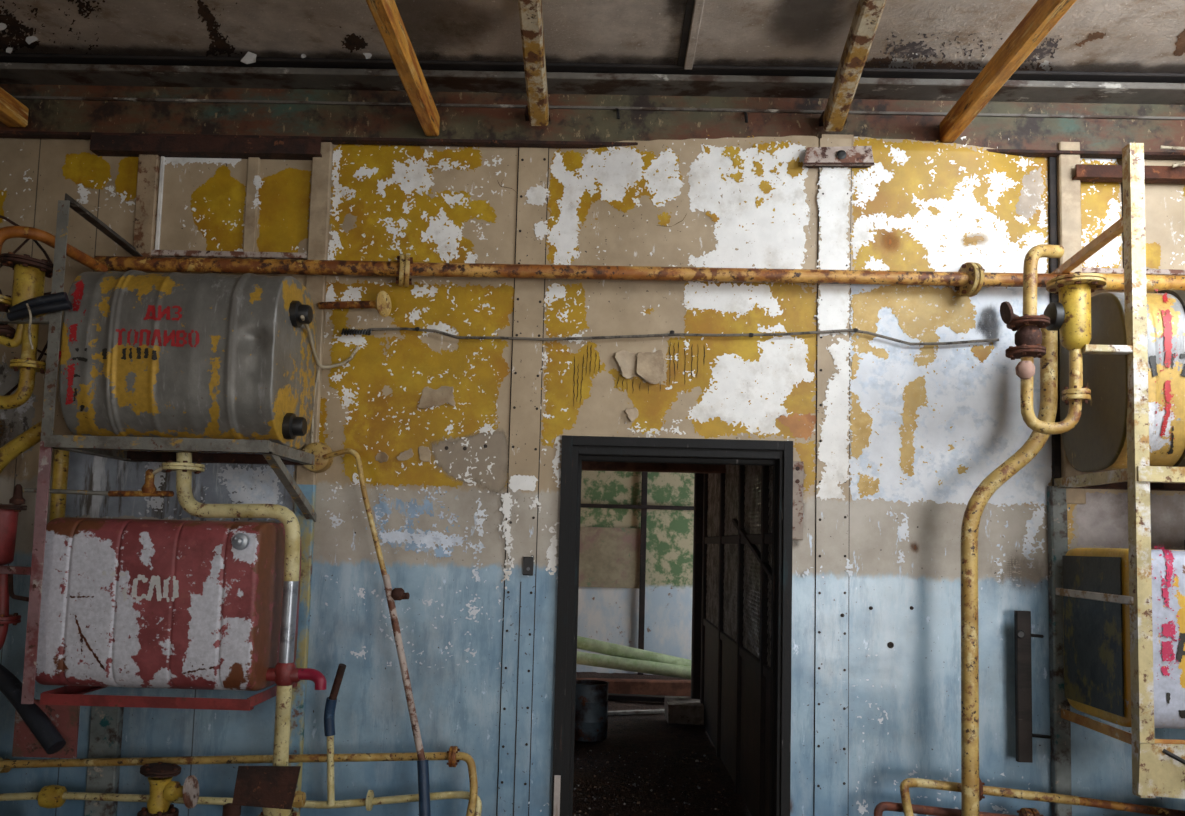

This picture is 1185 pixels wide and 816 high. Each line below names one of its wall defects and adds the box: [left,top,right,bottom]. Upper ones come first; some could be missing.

leakage [0,45,392,60]
leakage [545,56,677,65]
leakage [696,59,839,68]
leakage [864,60,987,70]
leakage [1016,63,1185,74]
peeling [62,152,139,212]
peeling [165,157,312,253]
peeling [328,144,507,263]
peeling [524,135,1050,563]
peeling [319,276,559,668]
peeling [988,435,1052,587]